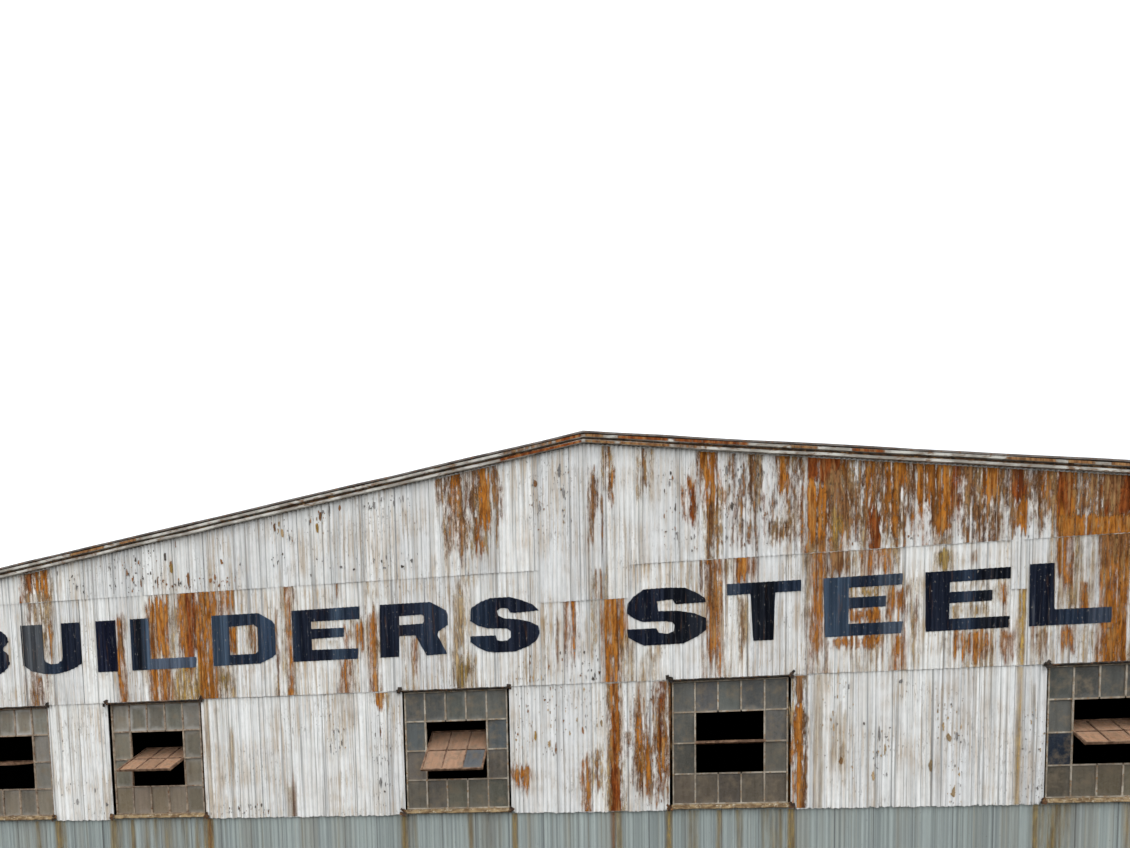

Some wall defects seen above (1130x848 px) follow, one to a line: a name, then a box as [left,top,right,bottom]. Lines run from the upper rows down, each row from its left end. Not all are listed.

rust [20,569,53,663]
rust [32,674,44,706]
rust [145,590,256,701]
rust [341,607,389,711]
rust [511,764,530,794]
rust [582,568,671,811]
rust [435,434,1130,688]
rust [789,675,808,808]